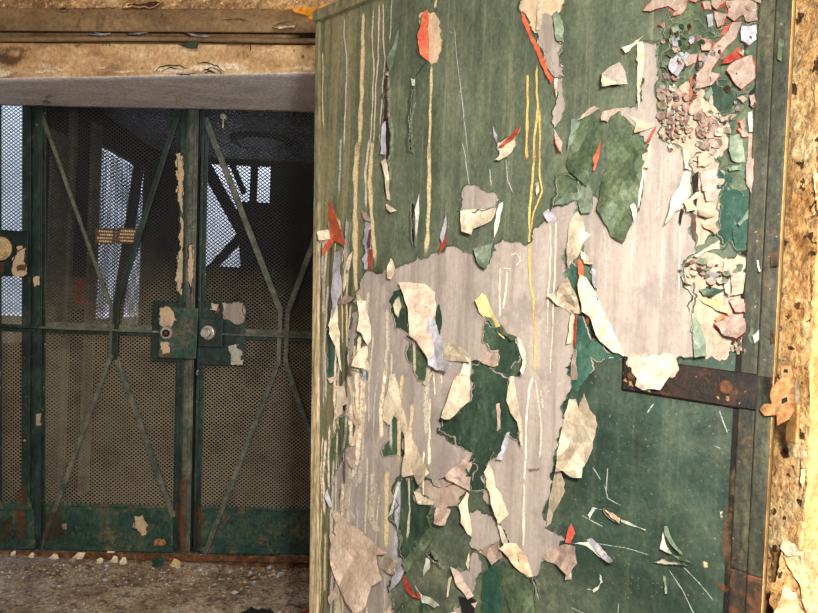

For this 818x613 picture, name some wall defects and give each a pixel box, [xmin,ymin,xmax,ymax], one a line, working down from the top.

flaking render [122,0,163,9]
peeling [769,251,778,267]
peeling [158,305,175,328]
peeling [210,299,247,326]
peeling [317,0,761,613]
peeling [160,341,171,357]
peeling [228,344,244,365]
peeling [133,514,167,546]
peeling [152,556,181,567]
flaking render [769,540,818,613]